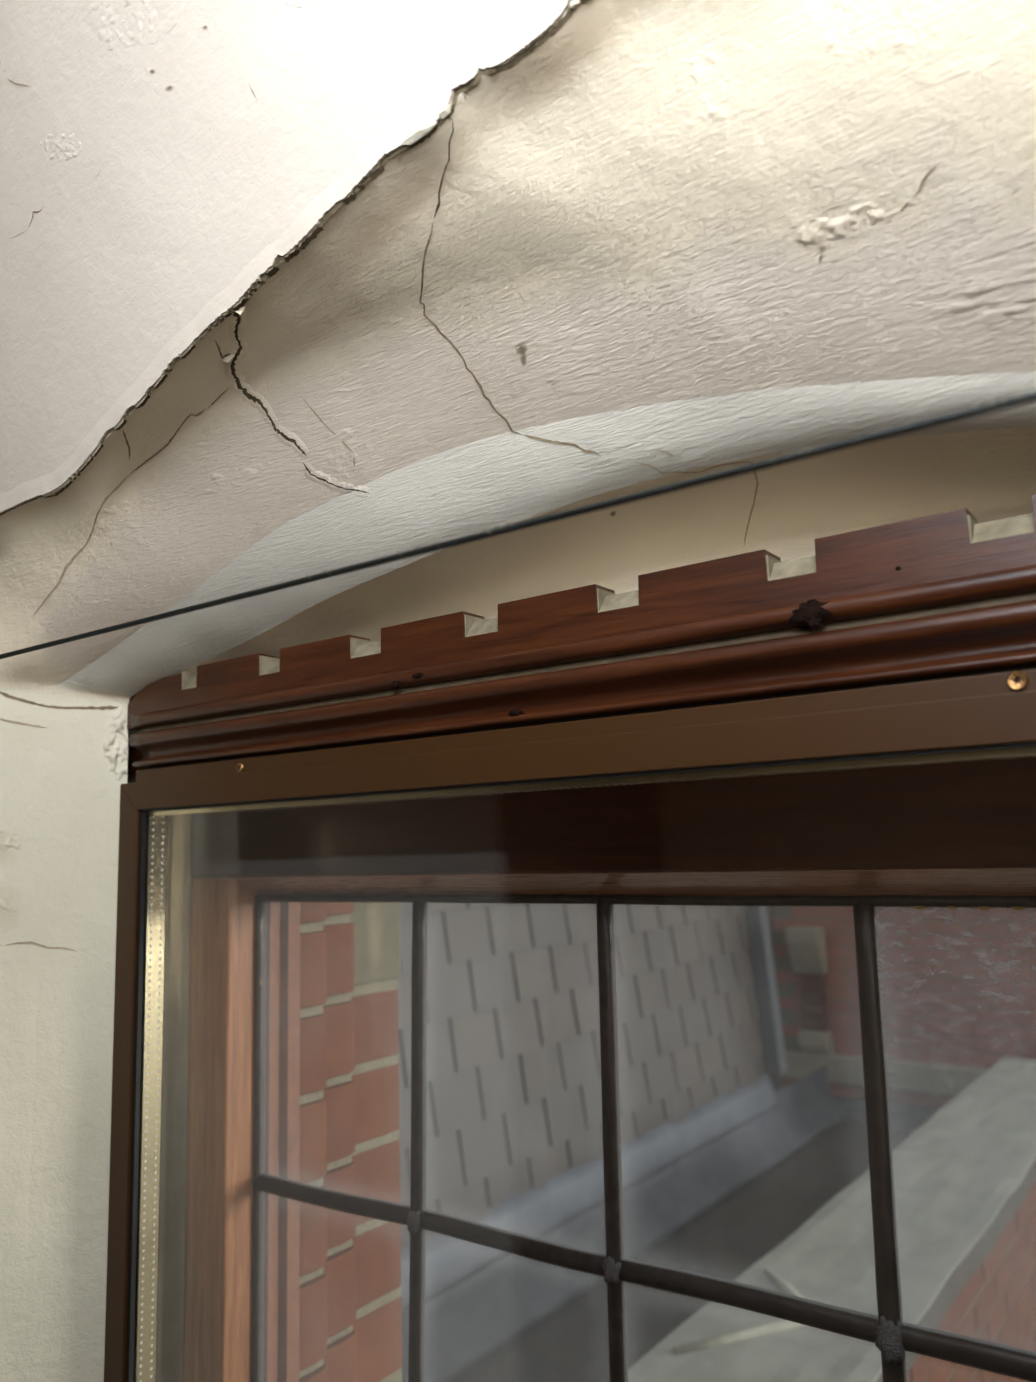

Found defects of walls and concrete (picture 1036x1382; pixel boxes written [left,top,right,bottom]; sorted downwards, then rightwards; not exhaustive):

crack [0,0,759,617]
crack [0,691,118,728]
crack [2,941,75,951]